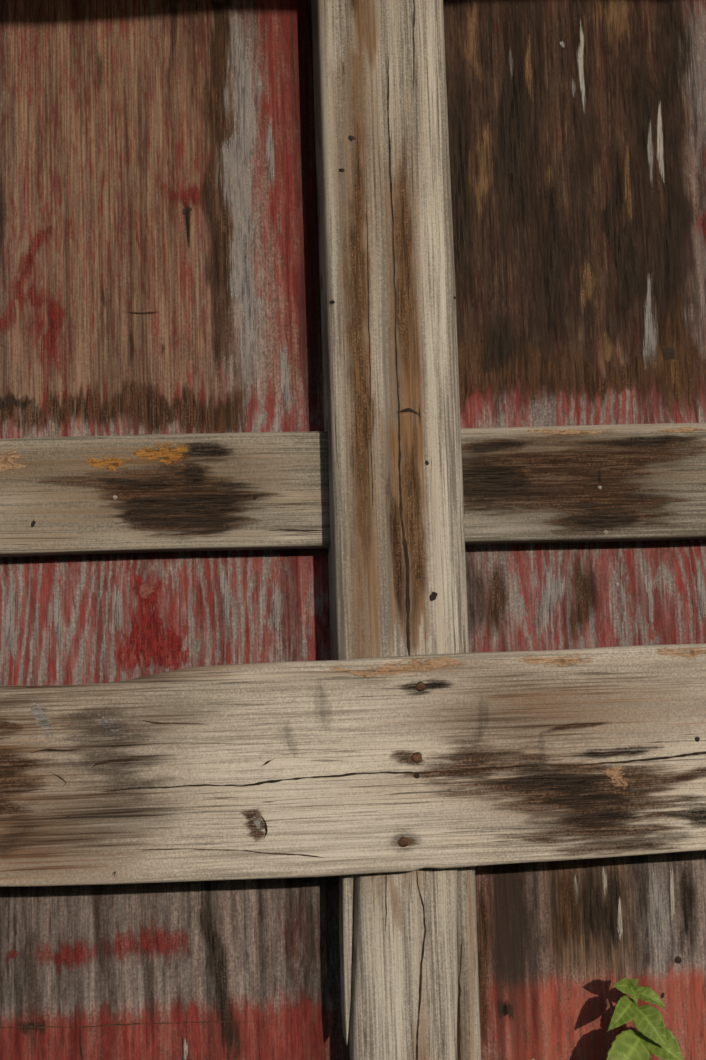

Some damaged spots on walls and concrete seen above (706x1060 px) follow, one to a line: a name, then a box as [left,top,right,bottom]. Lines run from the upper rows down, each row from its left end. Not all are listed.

peeling [572,29,585,108]
peeling [648,105,663,185]
leakage [447,0,694,412]
crack [358,0,421,656]
leakage [0,381,277,536]
leakage [461,432,706,533]
corrosion [402,680,452,695]
crack [32,749,447,858]
corrosion [392,751,424,764]
leakage [405,740,706,856]
crack [499,751,706,769]
crack [416,874,426,1060]